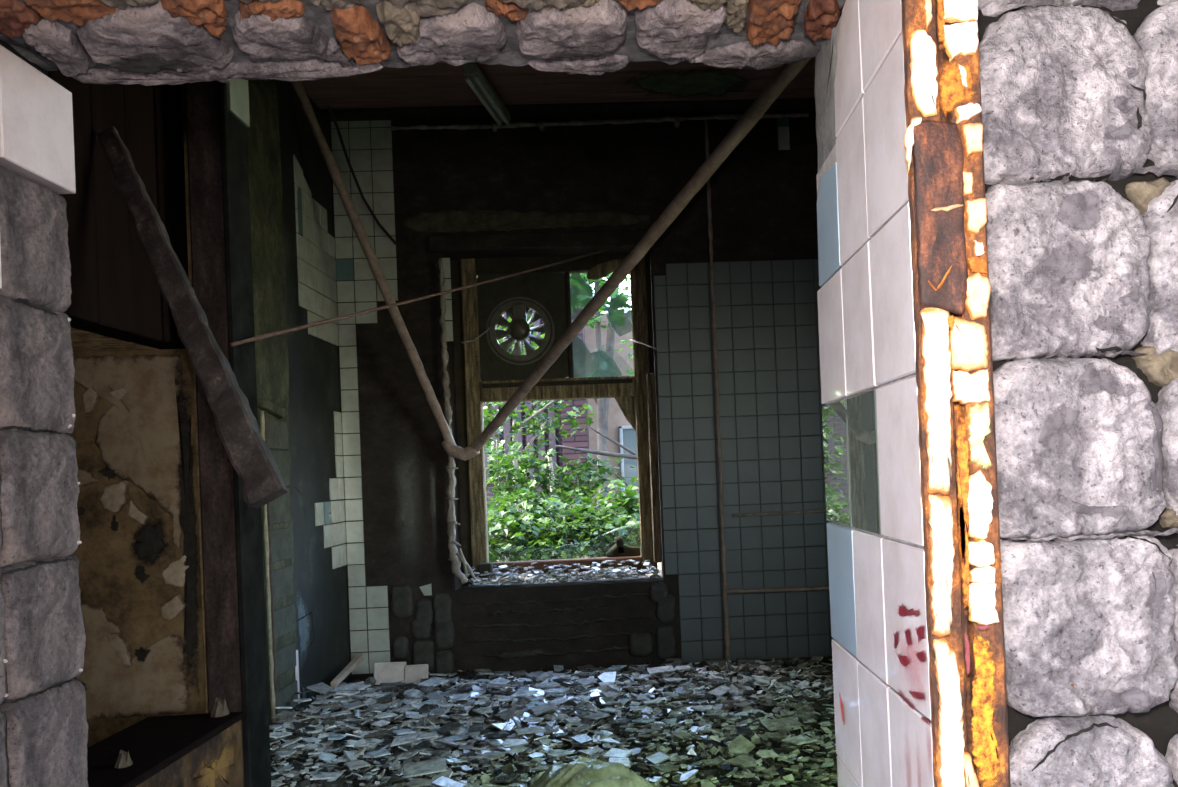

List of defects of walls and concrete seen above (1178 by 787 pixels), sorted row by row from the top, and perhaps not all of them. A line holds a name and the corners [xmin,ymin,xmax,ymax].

corrosion [937,0,945,41]
corrosion [938,62,974,113]
spalling [0,0,845,419]
leakage [132,519,168,583]
leakage [175,367,199,687]
corrosion [956,420,970,604]
leakage [135,647,150,662]
corrosion [971,636,1000,787]
crack [1032,722,1118,771]